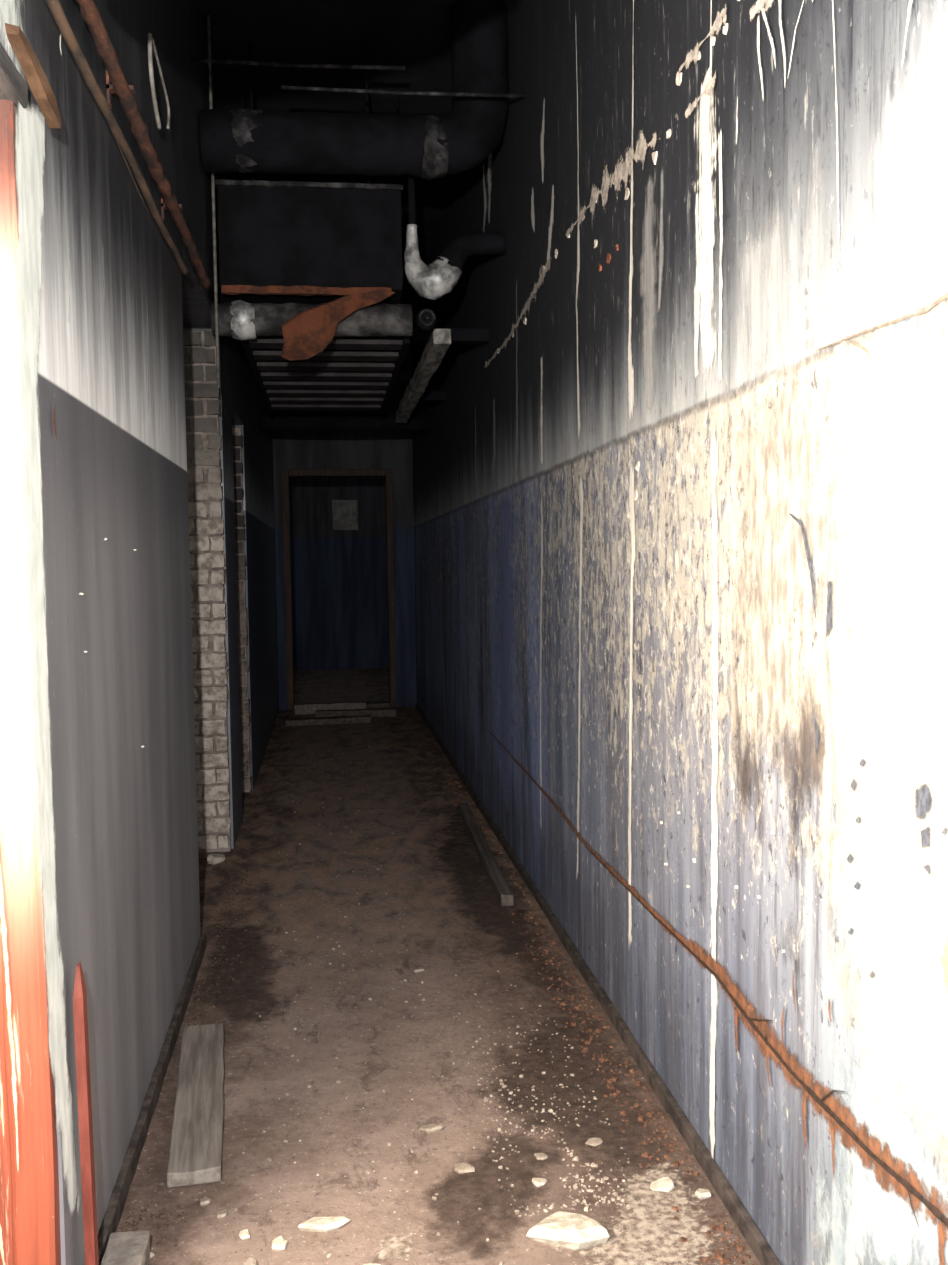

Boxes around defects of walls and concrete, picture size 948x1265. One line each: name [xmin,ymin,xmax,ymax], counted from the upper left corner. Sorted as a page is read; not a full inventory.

leakage [757,0,813,97]
leakage [483,153,492,231]
leakage [531,98,554,261]
leakage [694,0,738,380]
leakage [628,168,663,418]
leakage [742,229,788,367]
leakage [576,476,584,880]
leakage [709,426,719,1158]
leakage [736,744,756,805]
leakage [776,690,824,860]
rust [490,732,948,1265]